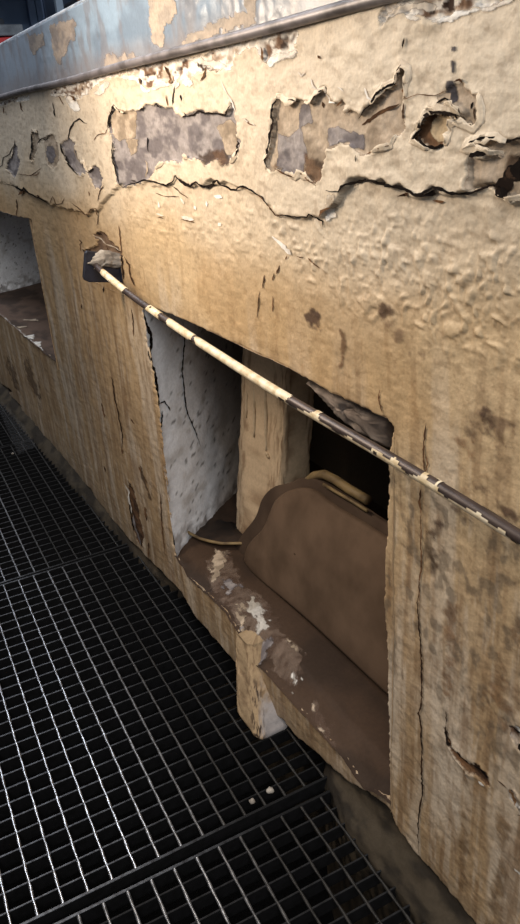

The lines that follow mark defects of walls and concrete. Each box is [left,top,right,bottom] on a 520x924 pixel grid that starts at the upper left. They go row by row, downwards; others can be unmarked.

peeling [148,0,177,47]
spalling [378,0,503,23]
spalling [0,118,103,189]
spalling [51,28,298,188]
spalling [263,60,520,202]
crack [11,169,499,316]
crack [101,380,134,454]
crack [131,309,201,446]
crack [158,495,166,544]
spalling [235,596,273,665]
crack [416,425,428,852]
hole [444,714,520,816]